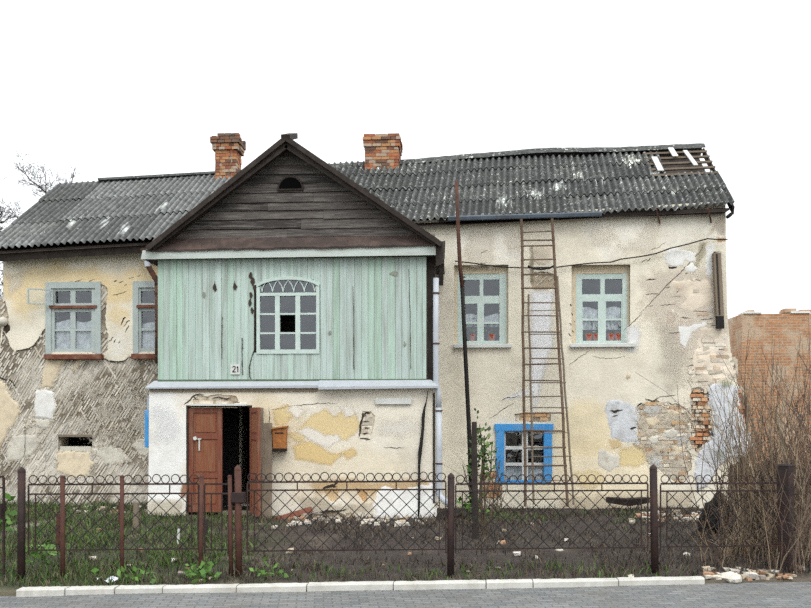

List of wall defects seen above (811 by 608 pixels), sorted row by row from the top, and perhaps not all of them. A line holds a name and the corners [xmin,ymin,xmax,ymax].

crack [626,242,704,328]
flaking render [0,360,83,461]
flaking render [56,446,132,480]
peeling [297,427,341,446]
flaking render [340,405,375,441]
flaking render [630,272,749,487]